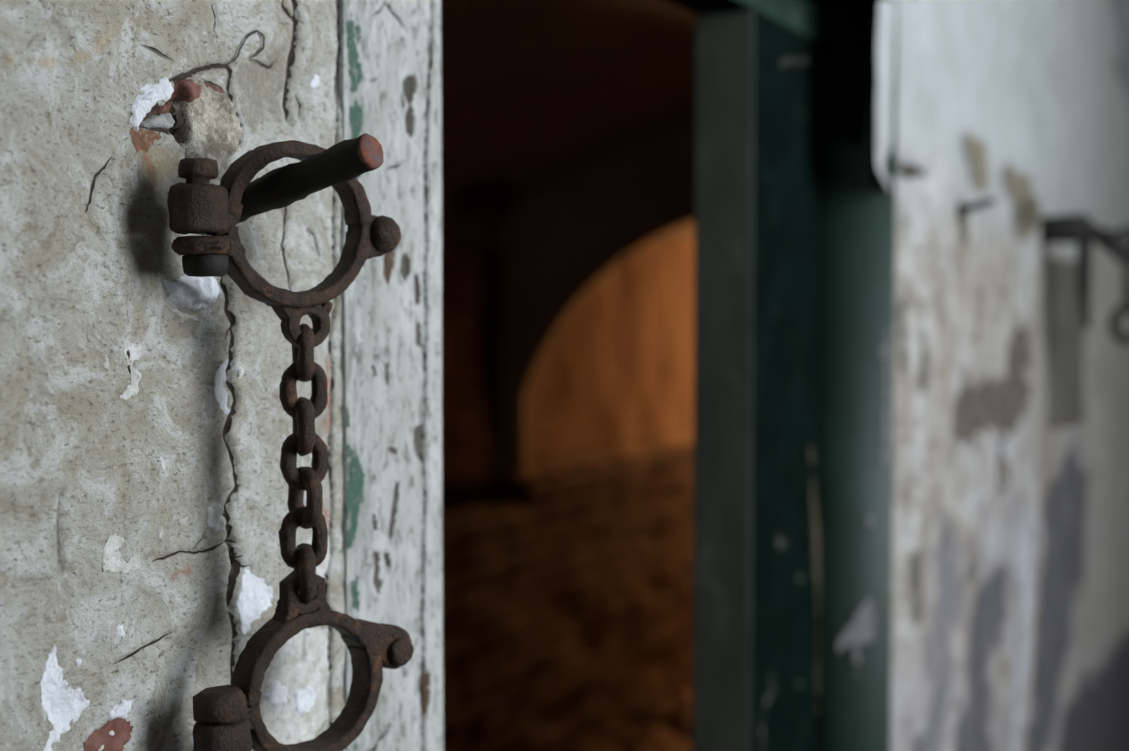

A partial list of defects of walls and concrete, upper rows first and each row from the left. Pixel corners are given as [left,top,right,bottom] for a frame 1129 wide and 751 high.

spalling [129,75,242,170]
crack [140,0,304,145]
crack [333,0,341,145]
peeling [401,75,417,137]
peeling [383,250,421,305]
crack [152,277,249,684]
crack [279,196,339,727]
peeling [347,444,400,594]
peeling [952,315,1031,493]
peeling [236,569,274,635]
peeling [40,646,90,751]
peeling [83,699,134,751]